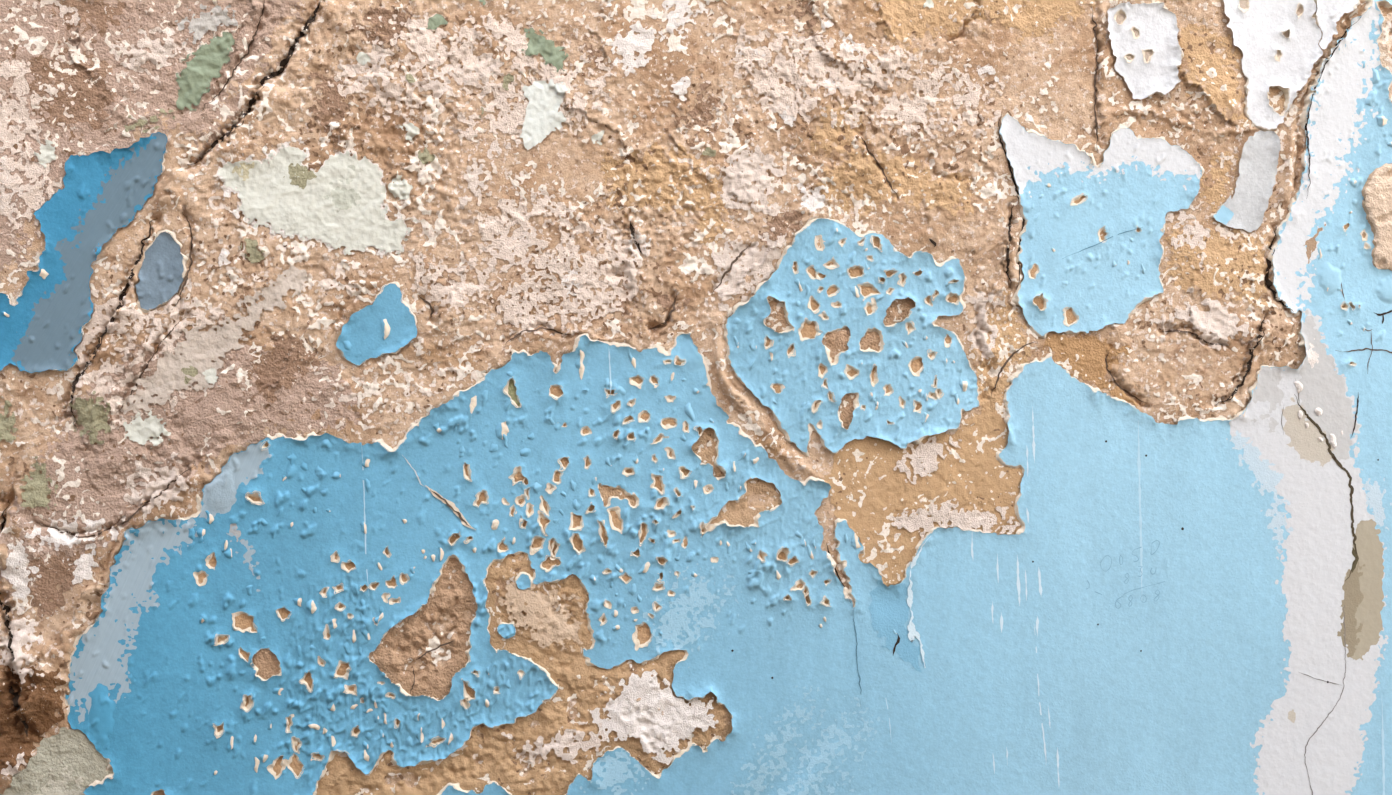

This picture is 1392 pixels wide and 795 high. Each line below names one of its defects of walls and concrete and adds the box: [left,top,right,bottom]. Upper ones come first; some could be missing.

peeling [0,12,294,390]
crack [187,0,324,165]
spalling [664,55,813,153]
peeling [796,0,1392,408]
crack [71,212,193,427]
peeling [193,552,218,586]
peeling [240,694,254,712]
spalling [214,611,282,681]
peeling [245,491,265,505]
spalling [267,10,782,795]
peeling [720,214,1023,672]
crack [1281,310,1392,795]